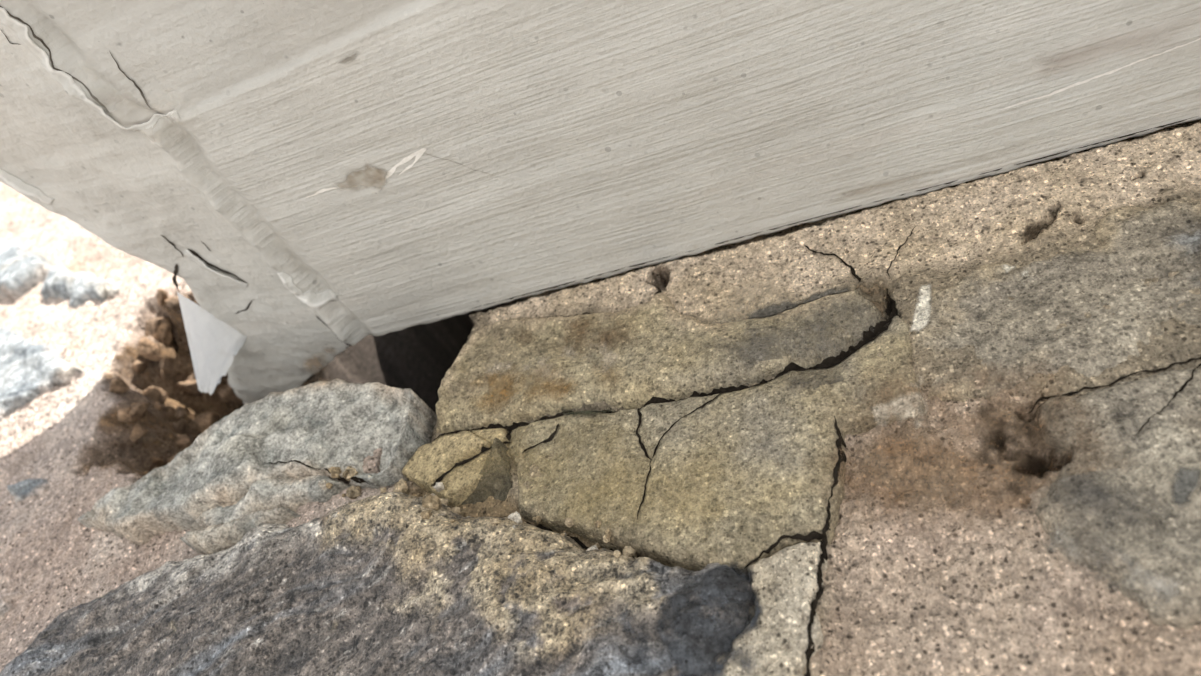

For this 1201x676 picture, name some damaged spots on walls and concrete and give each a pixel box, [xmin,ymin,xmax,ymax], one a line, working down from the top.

crack [0,6,180,132]
peeling [306,148,427,198]
crack [160,234,211,256]
crack [431,116,1201,519]
crack [525,521,635,559]
crack [744,416,847,676]